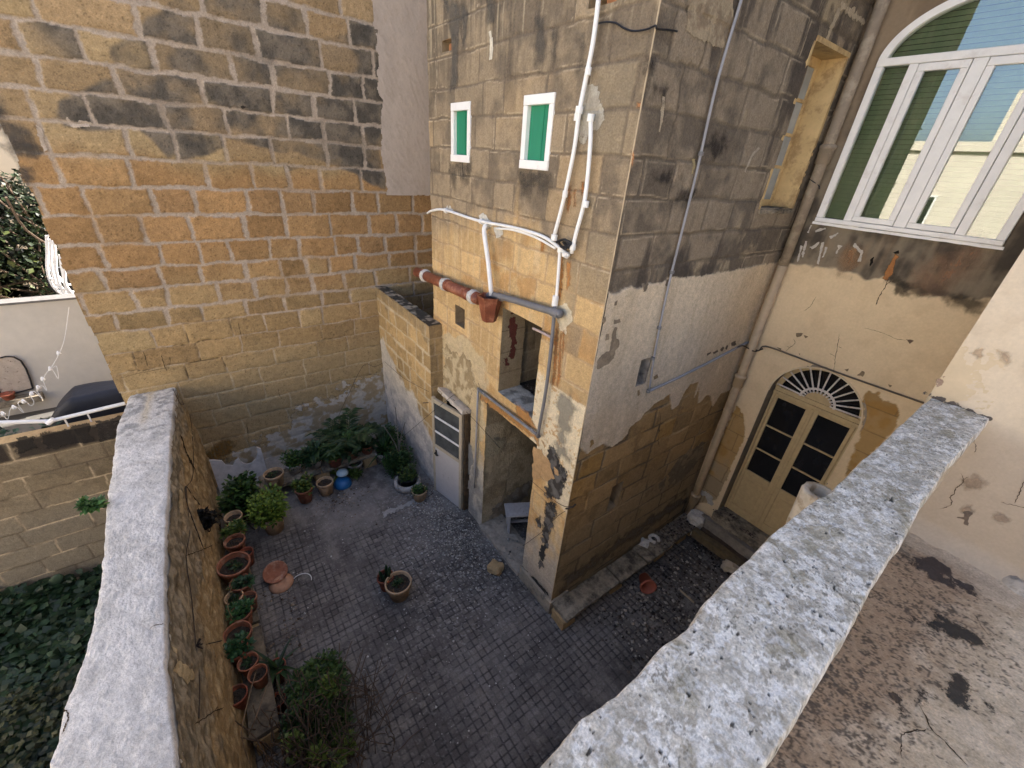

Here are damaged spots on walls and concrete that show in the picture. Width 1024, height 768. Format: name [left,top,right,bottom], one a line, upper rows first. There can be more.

damp [444,1,467,88]
damp [536,18,556,62]
damp [654,86,667,132]
damp [520,171,547,192]
damp [903,550,976,597]
damp [912,612,986,647]
crack [900,708,967,765]